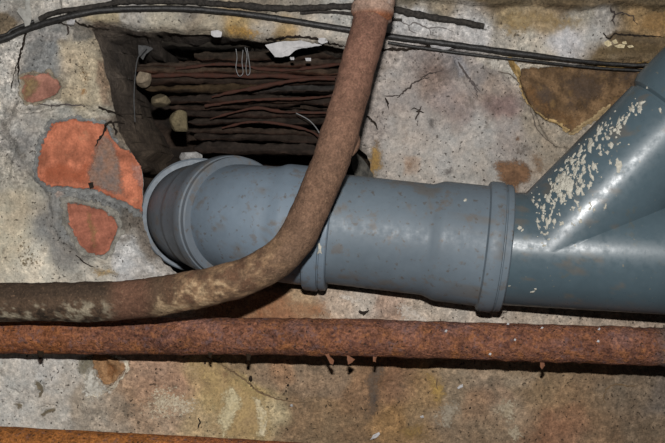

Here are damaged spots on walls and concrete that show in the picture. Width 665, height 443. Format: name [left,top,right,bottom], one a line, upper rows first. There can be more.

crack [11,33,27,89]
flaking render [265,35,344,60]
flaking render [18,69,65,106]
crack [385,71,440,109]
flaking render [508,57,650,135]
crack [40,103,125,147]
flaking render [32,115,144,260]
corrosion [496,159,531,192]
flaking render [87,354,130,398]